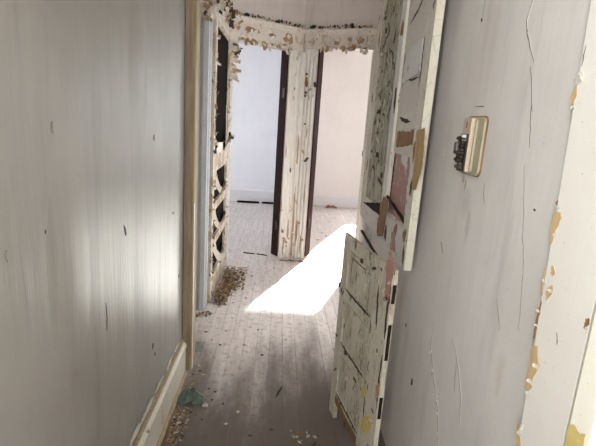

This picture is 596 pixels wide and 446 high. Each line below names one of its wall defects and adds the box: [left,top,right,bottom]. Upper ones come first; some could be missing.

peeling [200,0,404,144]
peeling [280,185,303,255]